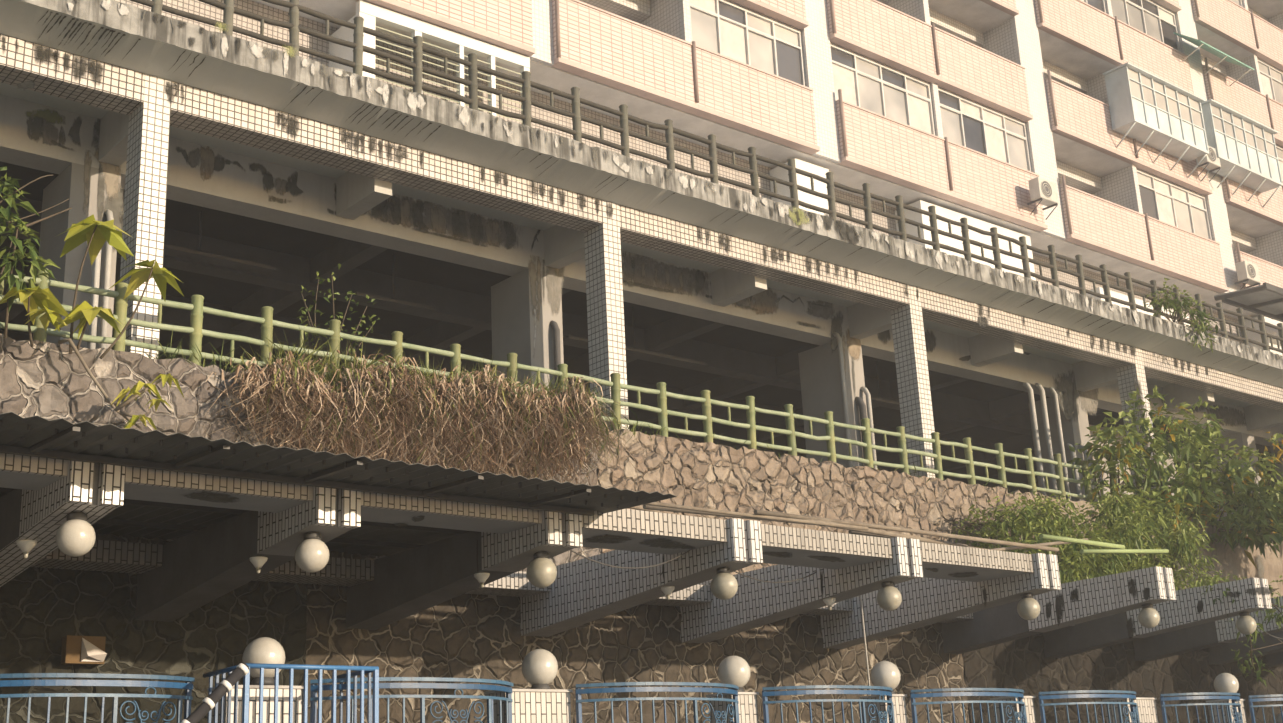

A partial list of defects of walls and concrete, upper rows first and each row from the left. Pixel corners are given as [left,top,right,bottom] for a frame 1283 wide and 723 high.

peeling [26,109,101,150]
peeling [176,147,303,203]
peeling [362,196,518,249]
peeling [622,252,712,299]
peeling [733,287,834,328]